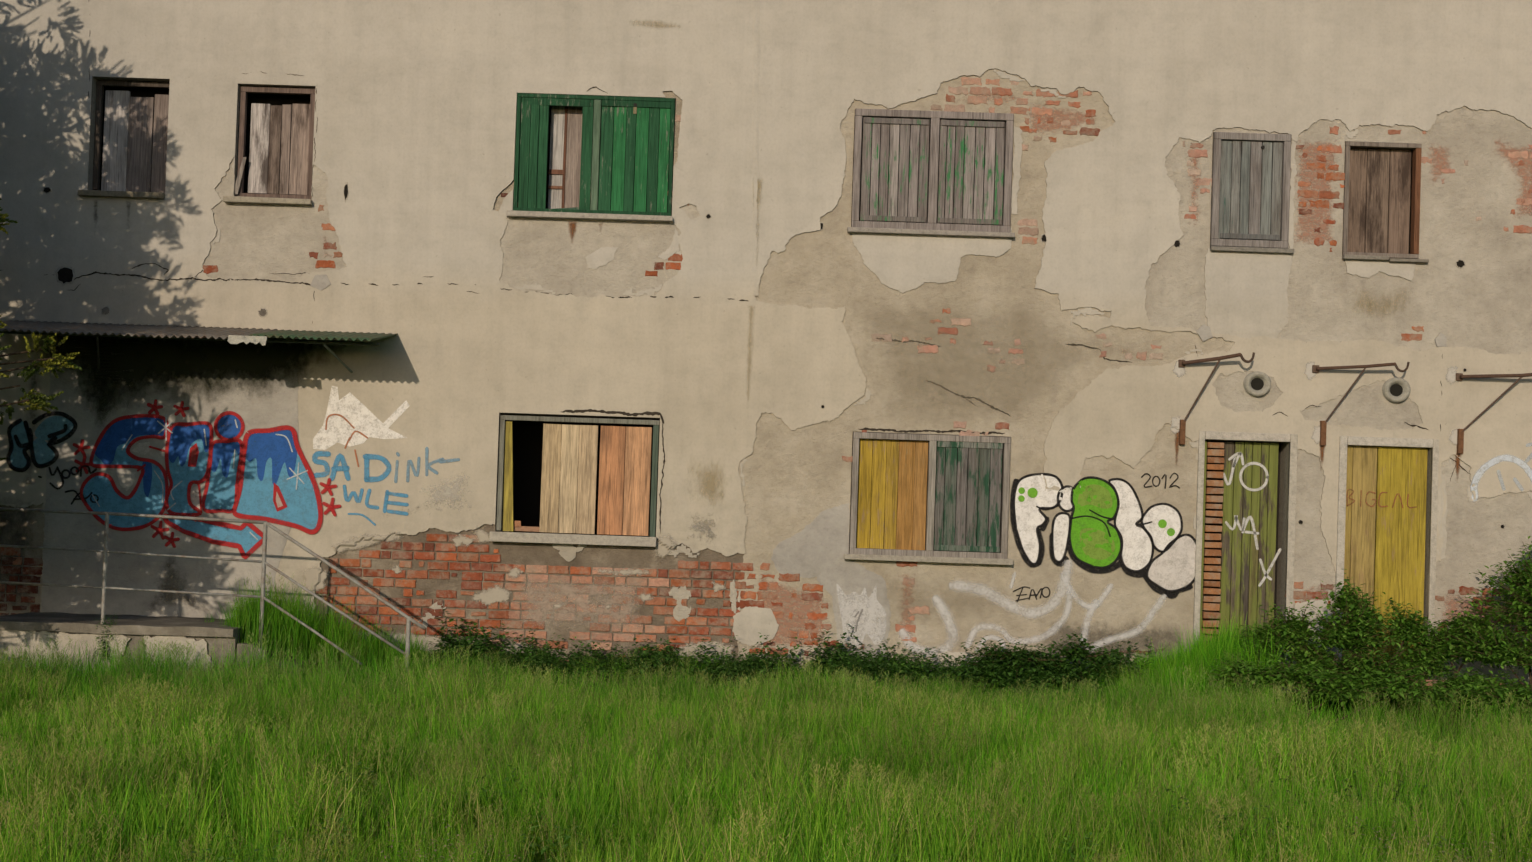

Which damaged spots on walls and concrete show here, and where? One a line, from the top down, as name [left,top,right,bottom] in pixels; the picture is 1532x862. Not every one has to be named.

flaking render [203,158,349,281]
crack [46,263,748,323]
flaking render [304,69,1532,685]
spalling [0,503,215,681]